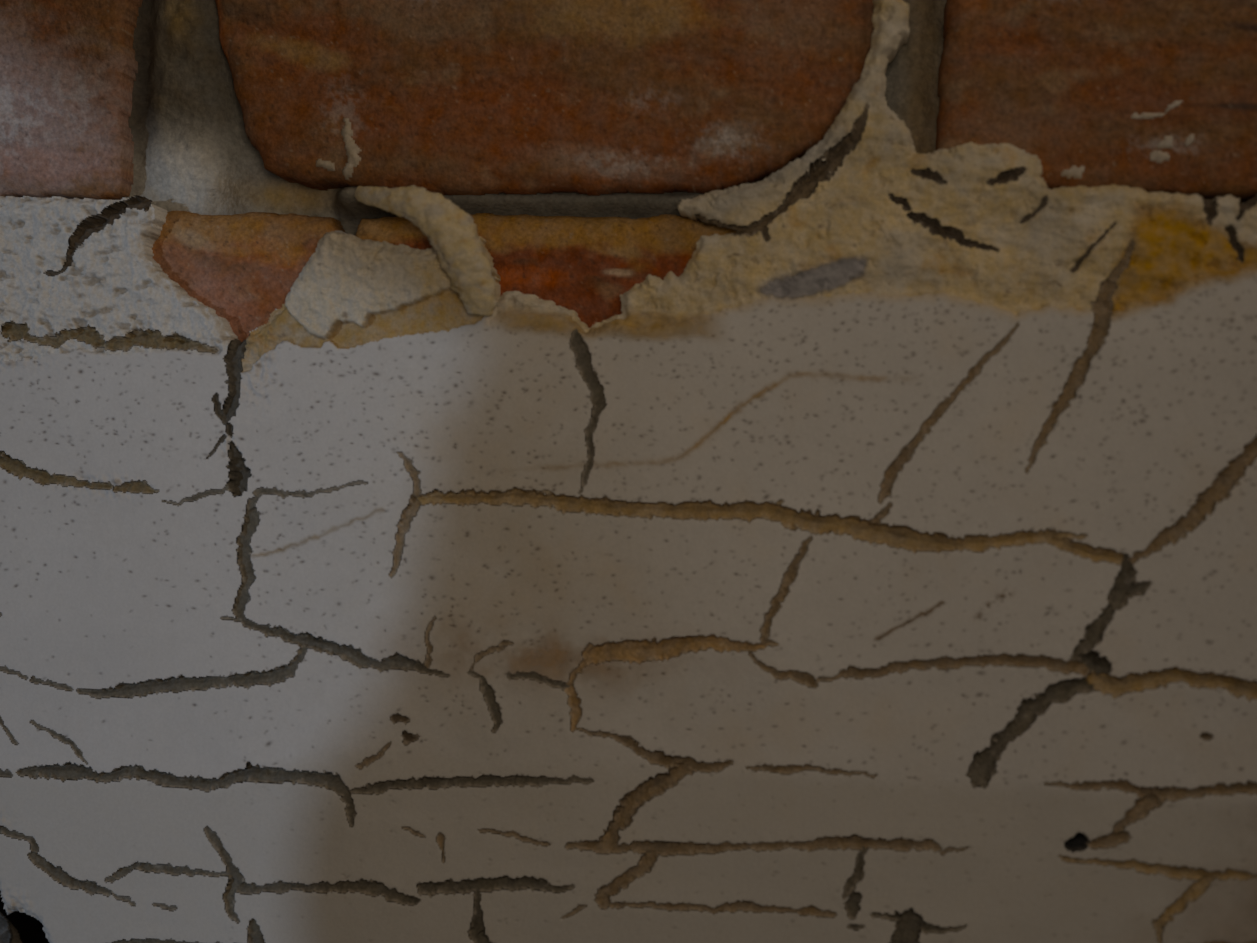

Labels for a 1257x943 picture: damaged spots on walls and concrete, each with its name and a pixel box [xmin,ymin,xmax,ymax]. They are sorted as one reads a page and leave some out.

crack [43,195,152,276]
flaking render [0,0,1257,373]
crack [888,168,1000,253]
crack [986,166,1048,224]
crack [1201,195,1257,263]
crack [1025,221,1136,474]
crack [0,320,1257,943]